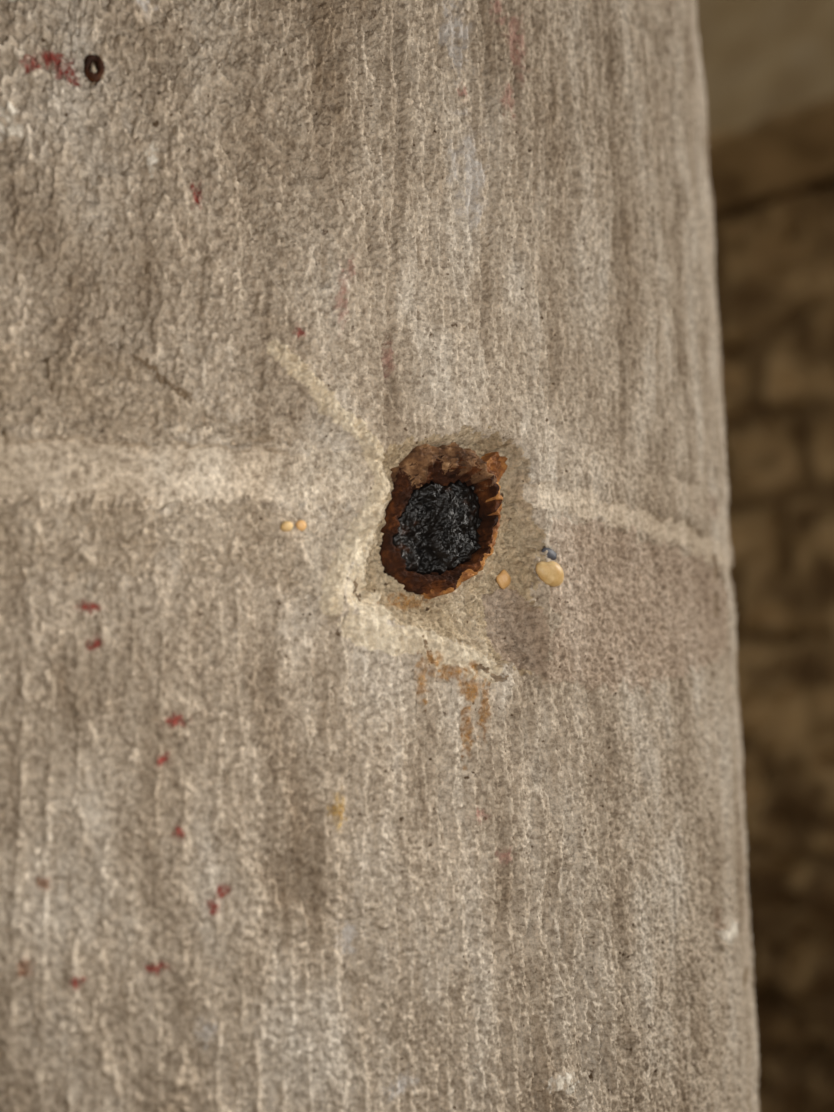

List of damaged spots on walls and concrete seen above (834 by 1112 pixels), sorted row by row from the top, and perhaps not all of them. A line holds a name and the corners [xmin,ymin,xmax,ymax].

corrosion [395,452,508,607]